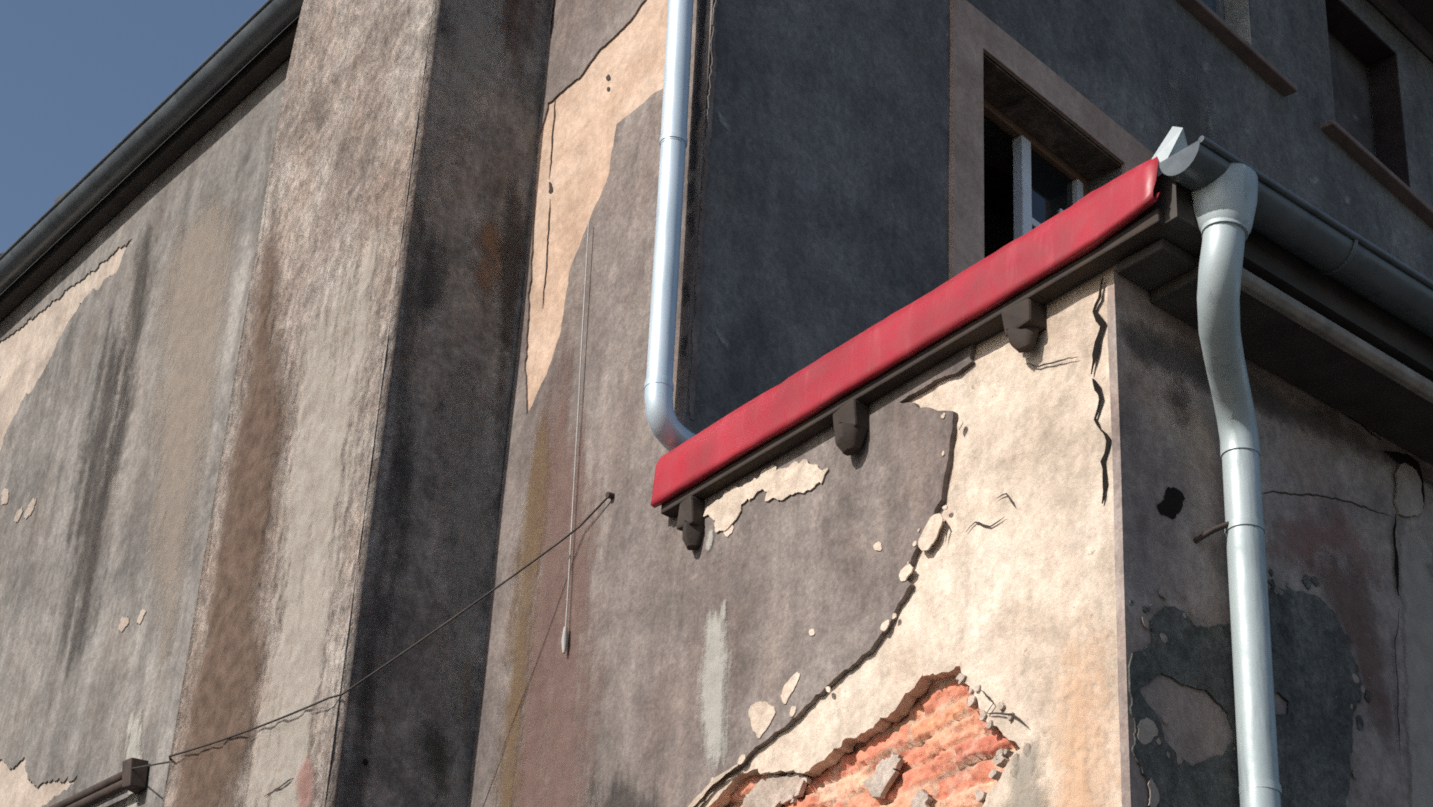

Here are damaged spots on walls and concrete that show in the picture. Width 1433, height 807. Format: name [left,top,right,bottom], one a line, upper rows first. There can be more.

peeling [0,759,75,807]
peeling [0,244,129,450]
water stain [67,235,149,659]
water stain [126,791,138,807]
water stain [126,712,142,759]
water stain [152,205,231,652]
water stain [173,224,376,807]
peeling [526,0,668,412]
peeling [688,264,1240,807]
crack [1028,278,1111,504]
peeling [1268,569,1372,807]
crack [1262,416,1433,763]